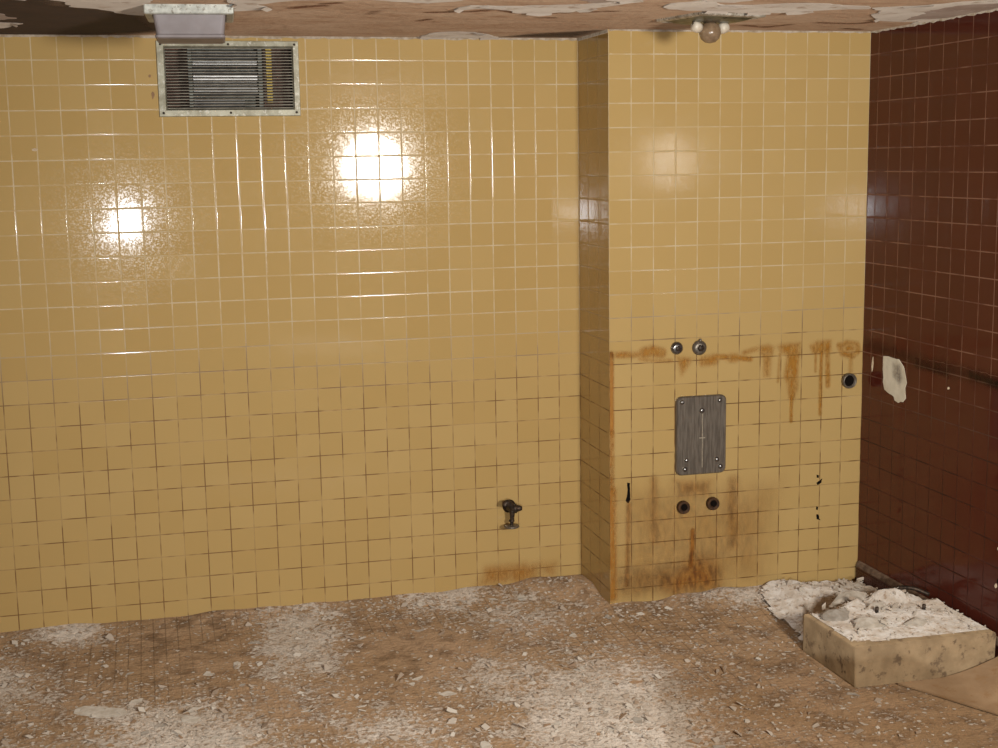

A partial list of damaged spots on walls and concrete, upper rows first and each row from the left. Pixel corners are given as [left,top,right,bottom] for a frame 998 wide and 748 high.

peeling [0,13,23,28]
peeling [54,0,153,16]
peeling [227,0,314,12]
peeling [379,0,643,16]
peeling [663,0,998,25]
peeling [417,31,499,40]
rust [783,345,798,422]
rust [813,342,859,415]
rust [610,347,665,600]
rust [675,529,715,590]